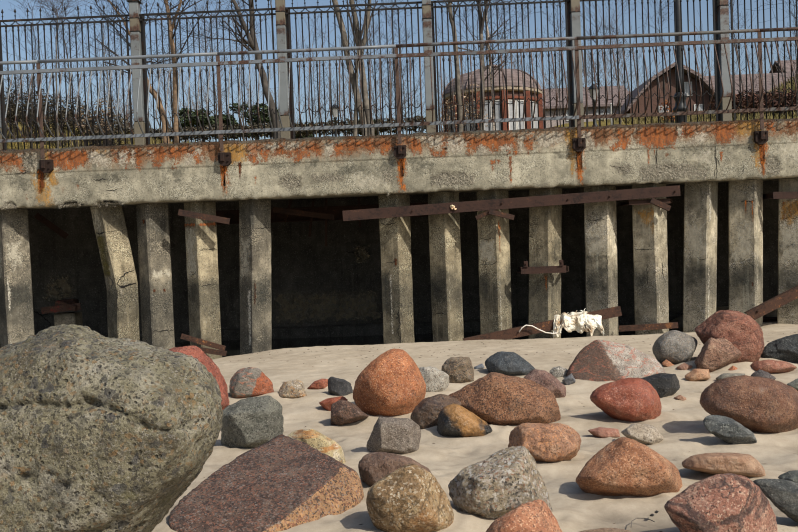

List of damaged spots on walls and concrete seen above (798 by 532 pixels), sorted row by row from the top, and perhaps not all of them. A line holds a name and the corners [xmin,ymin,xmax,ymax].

rust [33,169,64,204]
rust [220,135,419,191]
rust [565,122,722,183]
rust [731,121,798,175]